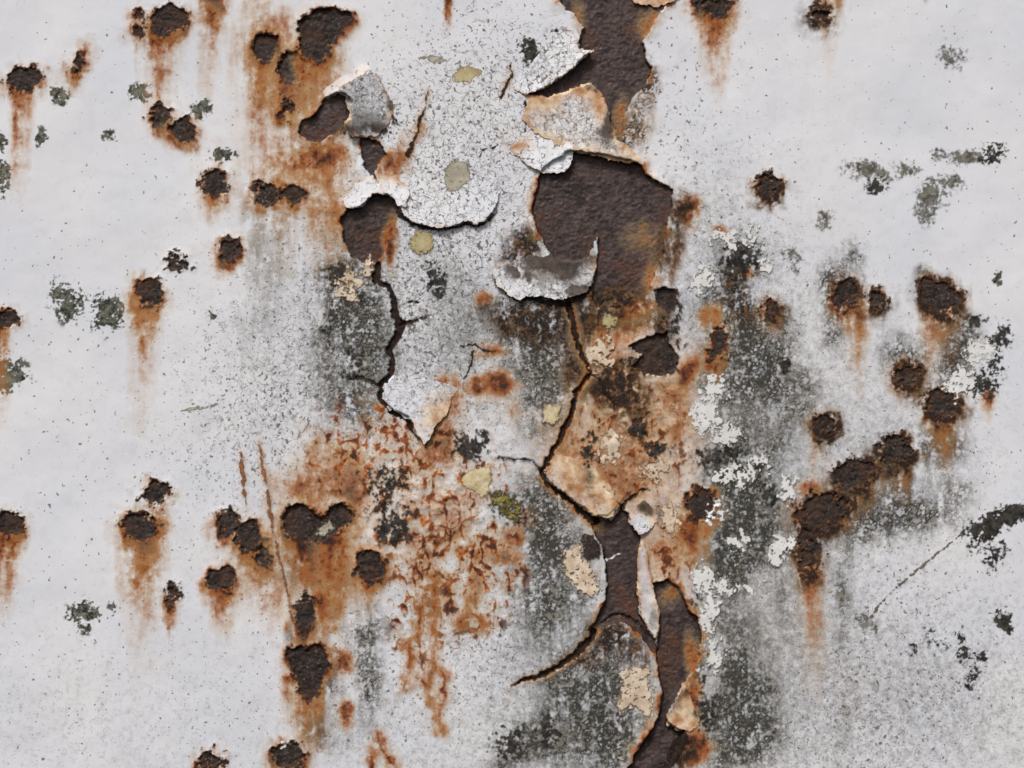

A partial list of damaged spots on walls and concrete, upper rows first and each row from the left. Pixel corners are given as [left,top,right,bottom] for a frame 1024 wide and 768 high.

rust [244,5,359,234]
peeling [298,64,434,307]
peeling [492,0,715,376]
mould [845,142,1008,224]
rust [198,369,529,768]
crack [353,262,428,440]
crack [494,280,650,526]
crack [513,613,649,686]
peeling [579,508,767,768]
mould [692,234,815,768]
rust [791,274,971,646]
mould [845,481,1024,574]